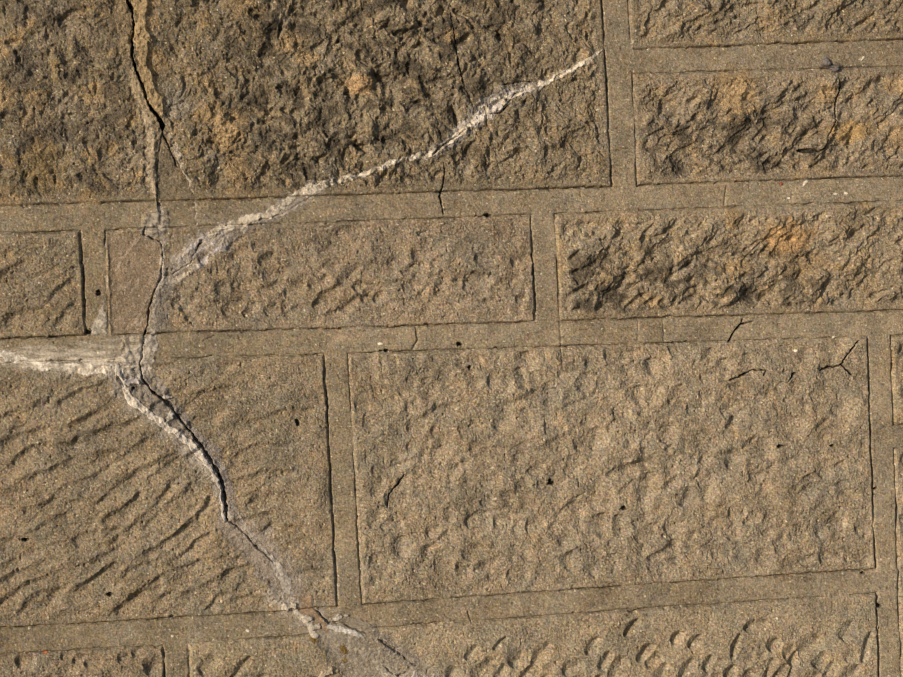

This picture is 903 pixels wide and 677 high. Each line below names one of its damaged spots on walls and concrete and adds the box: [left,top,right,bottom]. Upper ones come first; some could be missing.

damp [350,76,371,94]
damp [209,110,246,179]
crack [796,147,823,155]
crack [0,0,603,677]
crack [820,342,857,374]
spalling [316,617,434,677]